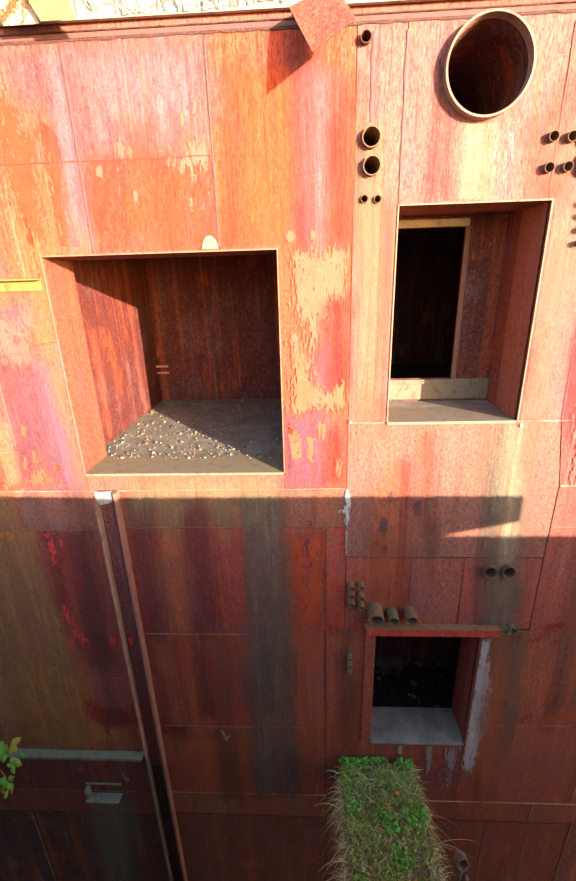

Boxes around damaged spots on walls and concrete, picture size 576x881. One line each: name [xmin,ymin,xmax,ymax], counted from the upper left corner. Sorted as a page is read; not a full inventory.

water stain [464,123,514,199]
water stain [556,139,576,171]
peeling [0,293,52,379]
peeling [283,229,357,463]
peeling [21,449,74,490]
water stain [444,217,574,787]